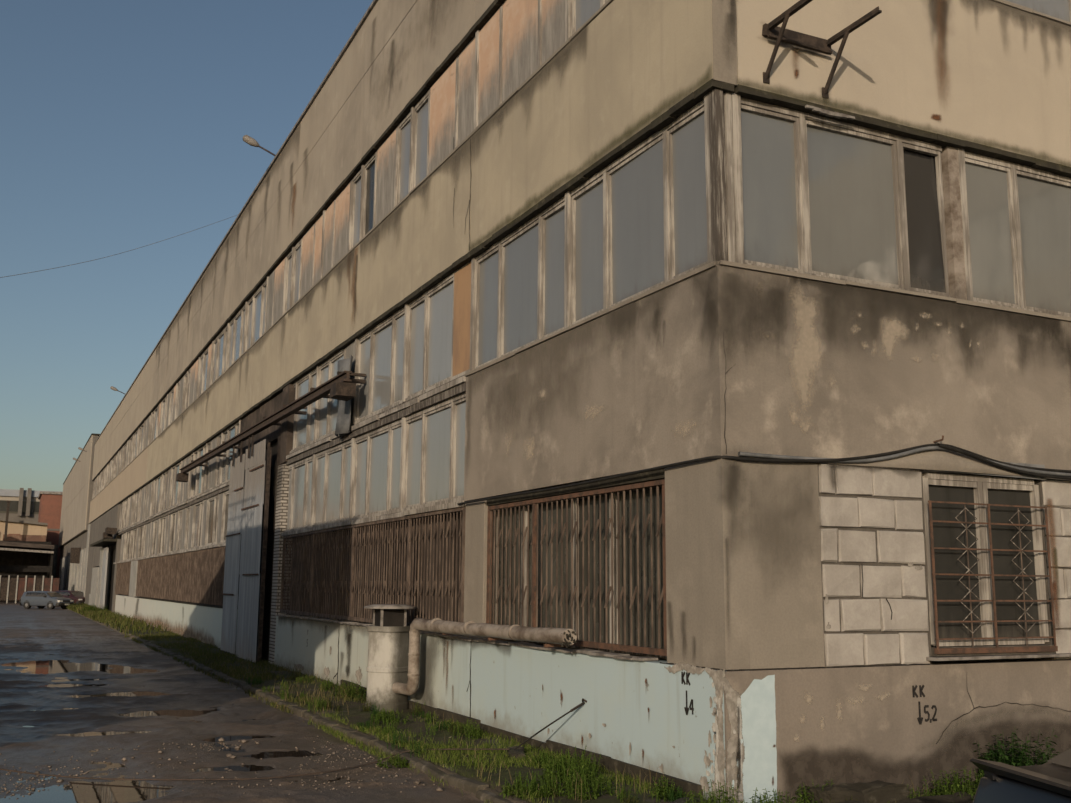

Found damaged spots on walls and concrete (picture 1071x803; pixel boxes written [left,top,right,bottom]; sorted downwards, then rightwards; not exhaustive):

leakage [933,0,945,79]
leakage [967,0,1071,32]
leakage [156,26,586,437]
leakage [469,302,634,382]
peeling [664,663,745,803]
leakage [783,721,1071,803]
crack [936,689,1071,744]